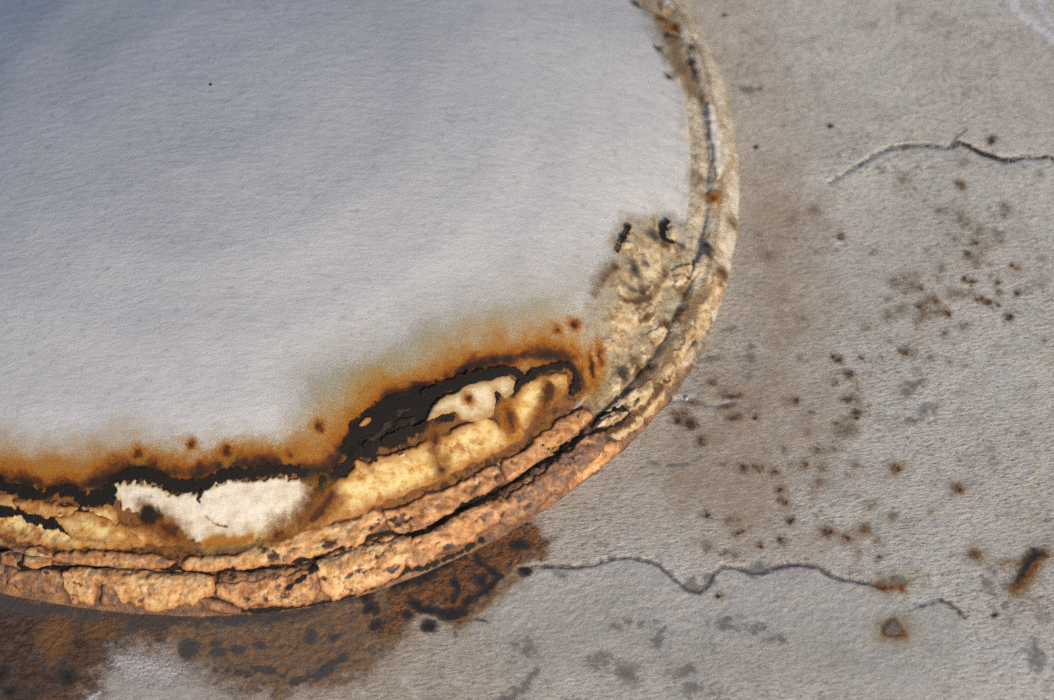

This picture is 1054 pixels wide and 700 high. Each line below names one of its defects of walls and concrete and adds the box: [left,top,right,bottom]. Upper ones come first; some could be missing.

corrosion [694,171,726,204]
peeling [706,103,724,180]
crack [829,130,1054,184]
corrosion [885,217,1042,325]
corrosion [0,266,729,527]
corrosion [831,355,870,437]
peeling [0,273,723,615]
corrosion [650,367,810,537]
corrosion [790,448,837,487]
corrosion [0,515,552,700]
corrosion [822,525,883,563]
corrosion [983,548,1049,596]